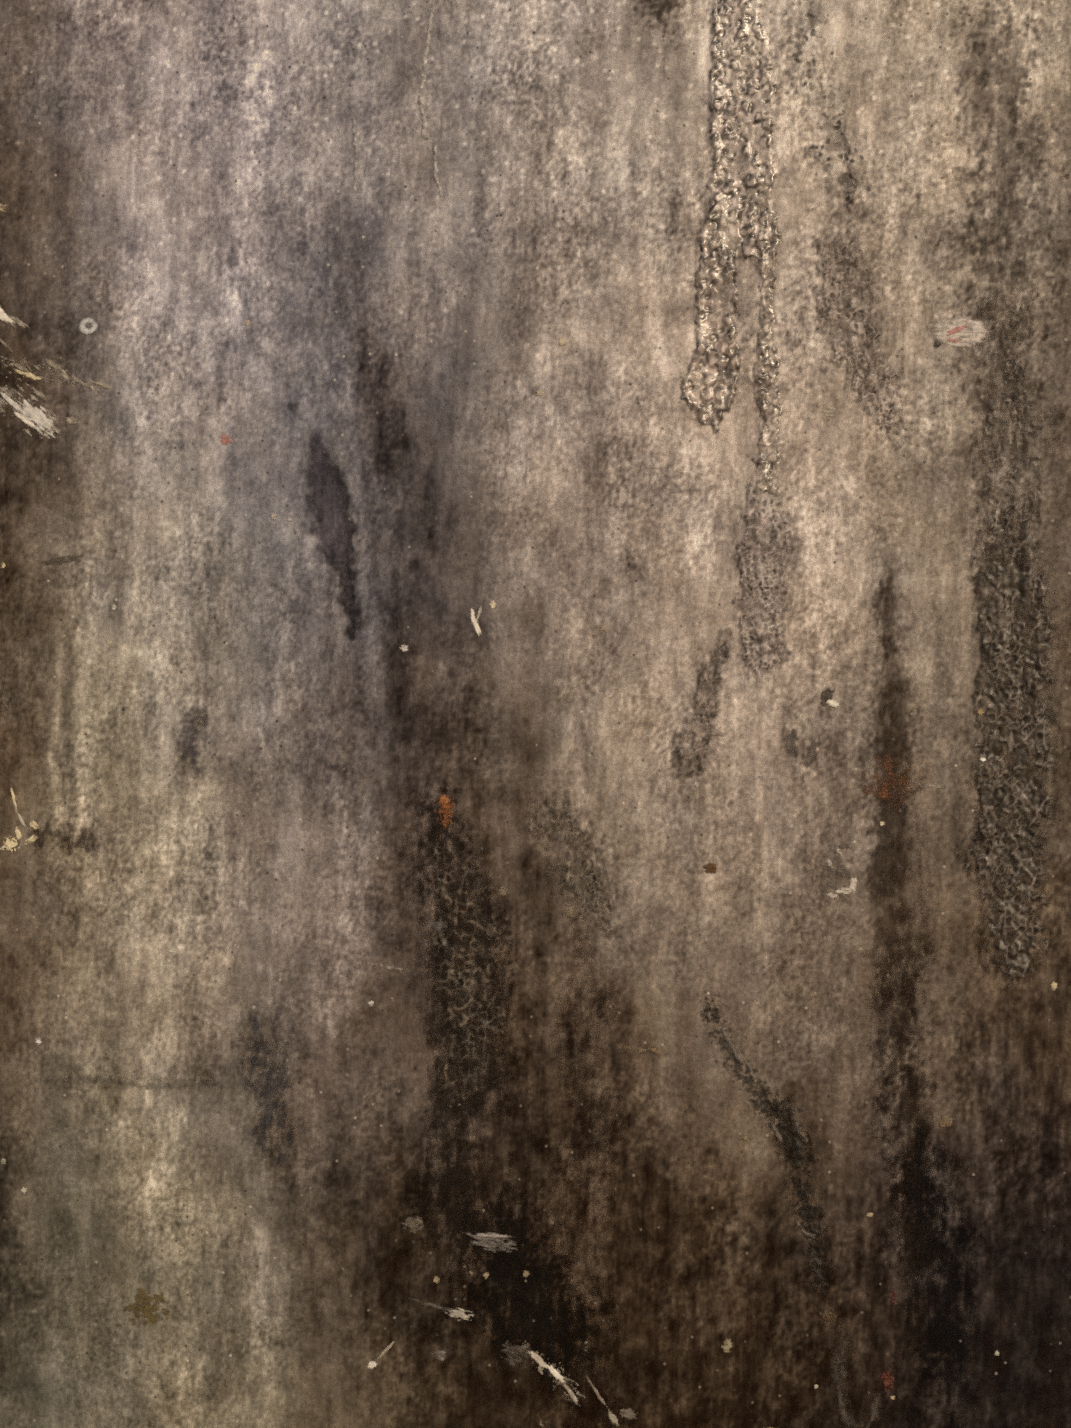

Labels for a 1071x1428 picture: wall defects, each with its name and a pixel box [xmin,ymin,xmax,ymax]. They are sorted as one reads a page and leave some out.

peeling [15,359,110,397]
peeling [1,388,77,433]
corrosion [438,794,454,828]
water stain [420,806,592,1387]